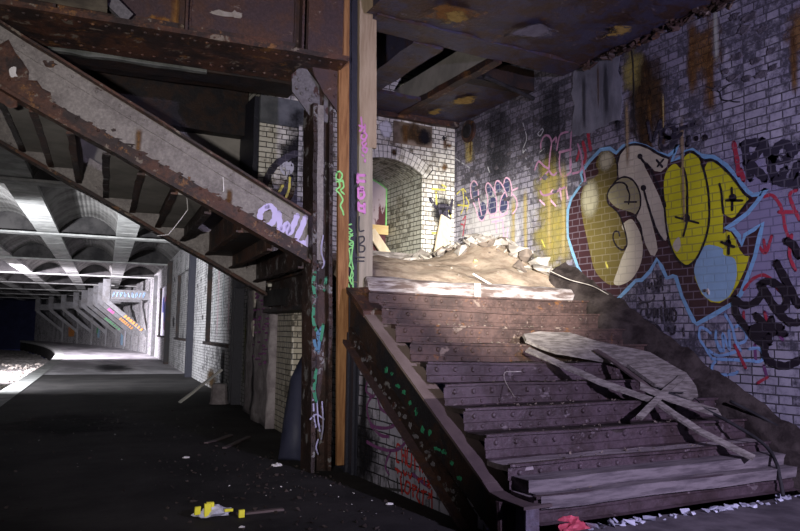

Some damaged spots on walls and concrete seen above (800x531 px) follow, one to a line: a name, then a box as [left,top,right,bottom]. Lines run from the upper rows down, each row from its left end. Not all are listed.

rust [425,4,488,27]
peeling [0,39,53,101]
rust [688,21,722,108]
water stain [379,121,432,149]
water stain [511,92,570,267]